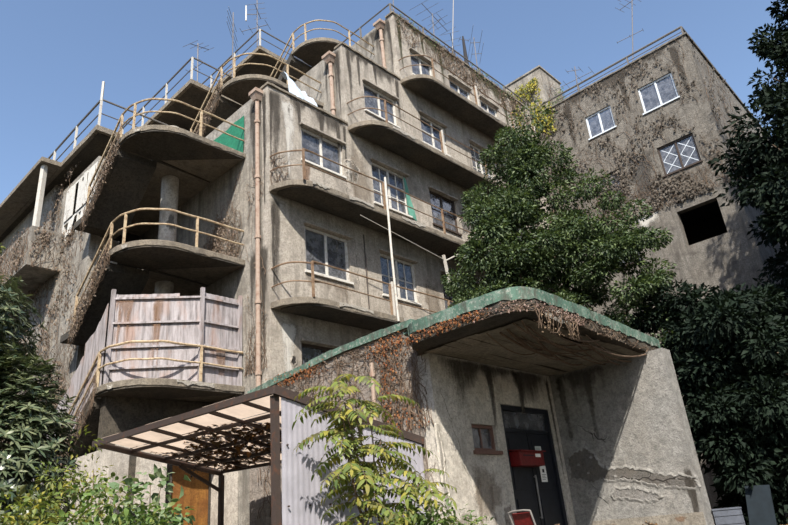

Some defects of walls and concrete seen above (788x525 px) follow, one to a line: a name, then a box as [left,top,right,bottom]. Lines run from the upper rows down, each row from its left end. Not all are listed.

water stain [485,368,496,420]
water stain [546,367,601,463]